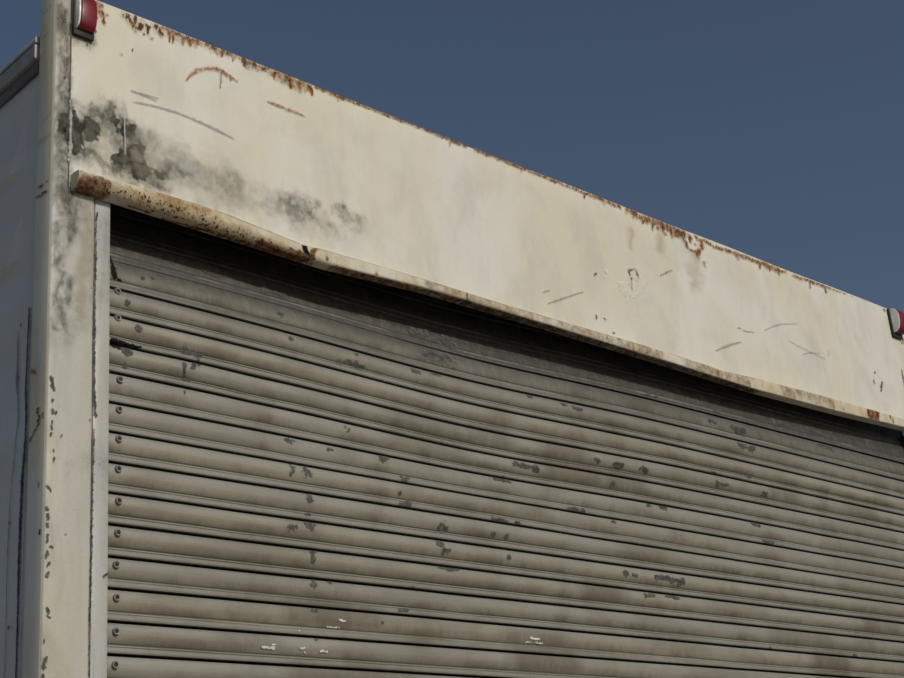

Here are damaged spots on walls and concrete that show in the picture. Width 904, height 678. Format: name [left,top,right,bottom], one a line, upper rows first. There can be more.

corrosion [123,13,846,294]
corrosion [74,174,759,394]
peeling [50,375,63,437]
peeling [45,506,54,577]
peeling [436,520,452,554]